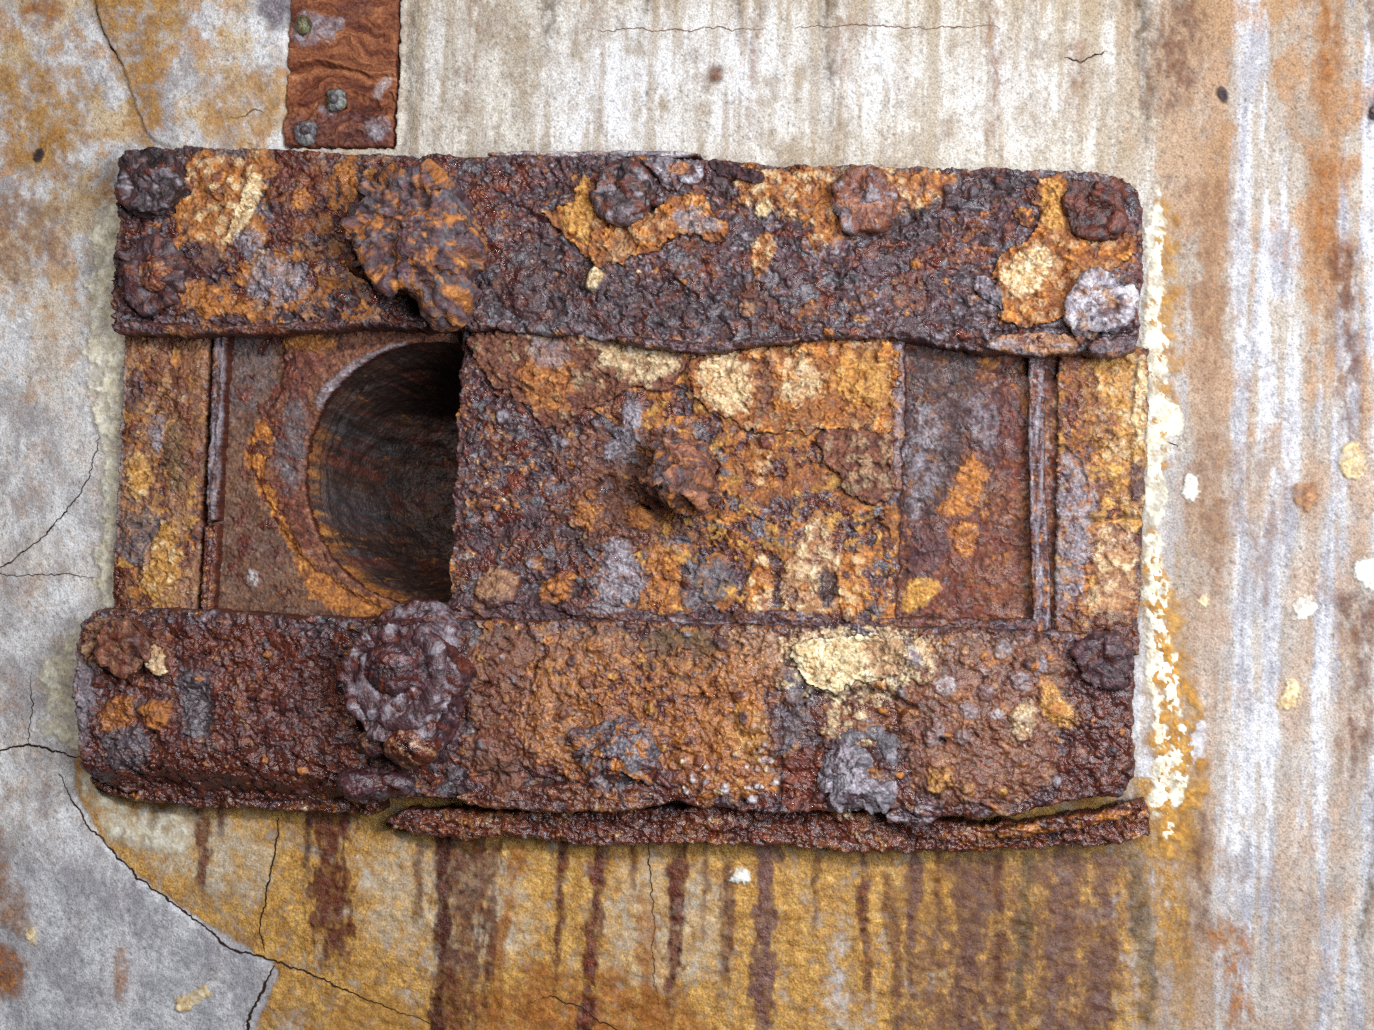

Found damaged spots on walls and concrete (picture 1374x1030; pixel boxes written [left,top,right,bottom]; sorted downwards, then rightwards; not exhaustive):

crack [95,0,124,66]
crack [598,25,760,33]
crack [797,22,1000,30]
corrosion [541,155,765,269]
corrosion [973,172,1138,331]
corrosion [466,331,902,506]
crack [0,415,108,578]
water stain [1181,474,1201,501]
water stain [1354,558,1374,592]
corrosion [789,633,909,696]
crack [0,672,438,1030]
corrosion [75,751,1206,1030]